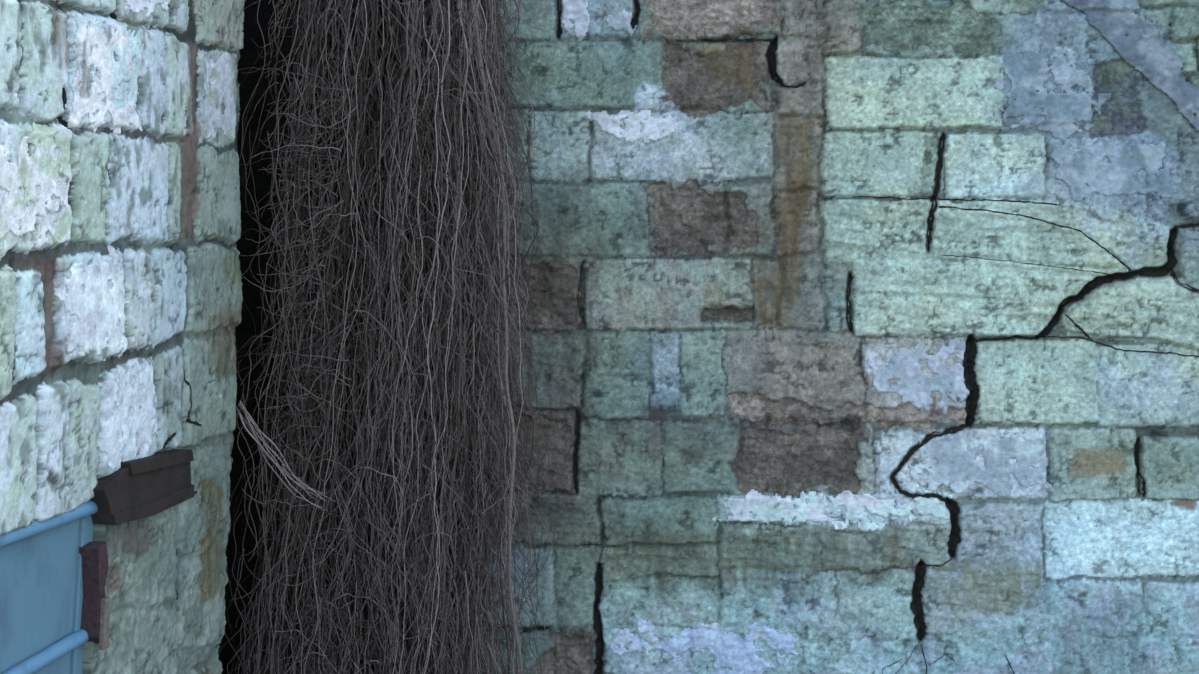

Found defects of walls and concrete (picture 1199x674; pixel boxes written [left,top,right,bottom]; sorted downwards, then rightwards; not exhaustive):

crack [555,0,563,38]
crack [630,0,640,29]
crack [676,37,806,88]
crack [846,273,854,334]
crack [861,133,1199,674]
crack [594,563,604,674]